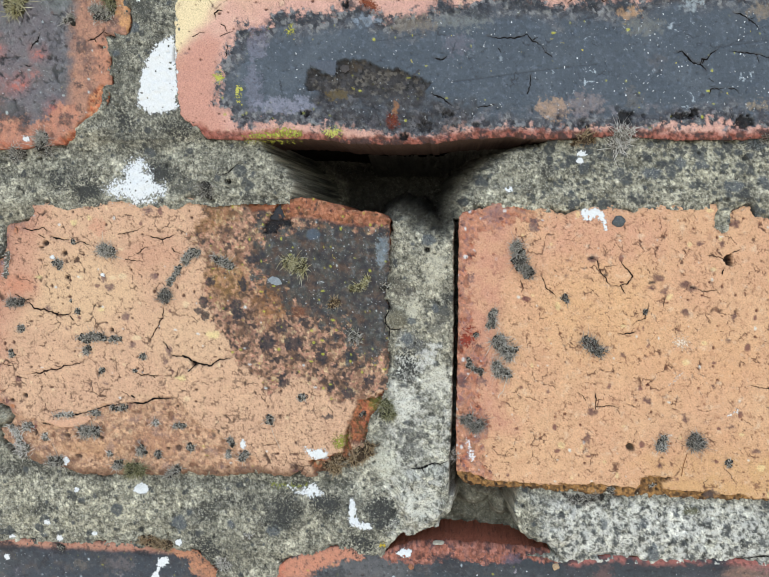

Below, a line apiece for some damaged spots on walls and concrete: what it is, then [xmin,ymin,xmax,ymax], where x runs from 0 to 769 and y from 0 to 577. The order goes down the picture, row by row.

crack [489,34,552,57]
spalling [305,59,431,116]
crack [678,49,768,92]
crack [15,294,74,321]
crack [150,309,233,372]
crack [3,363,80,379]
spalling [439,203,769,531]
crack [73,373,175,416]